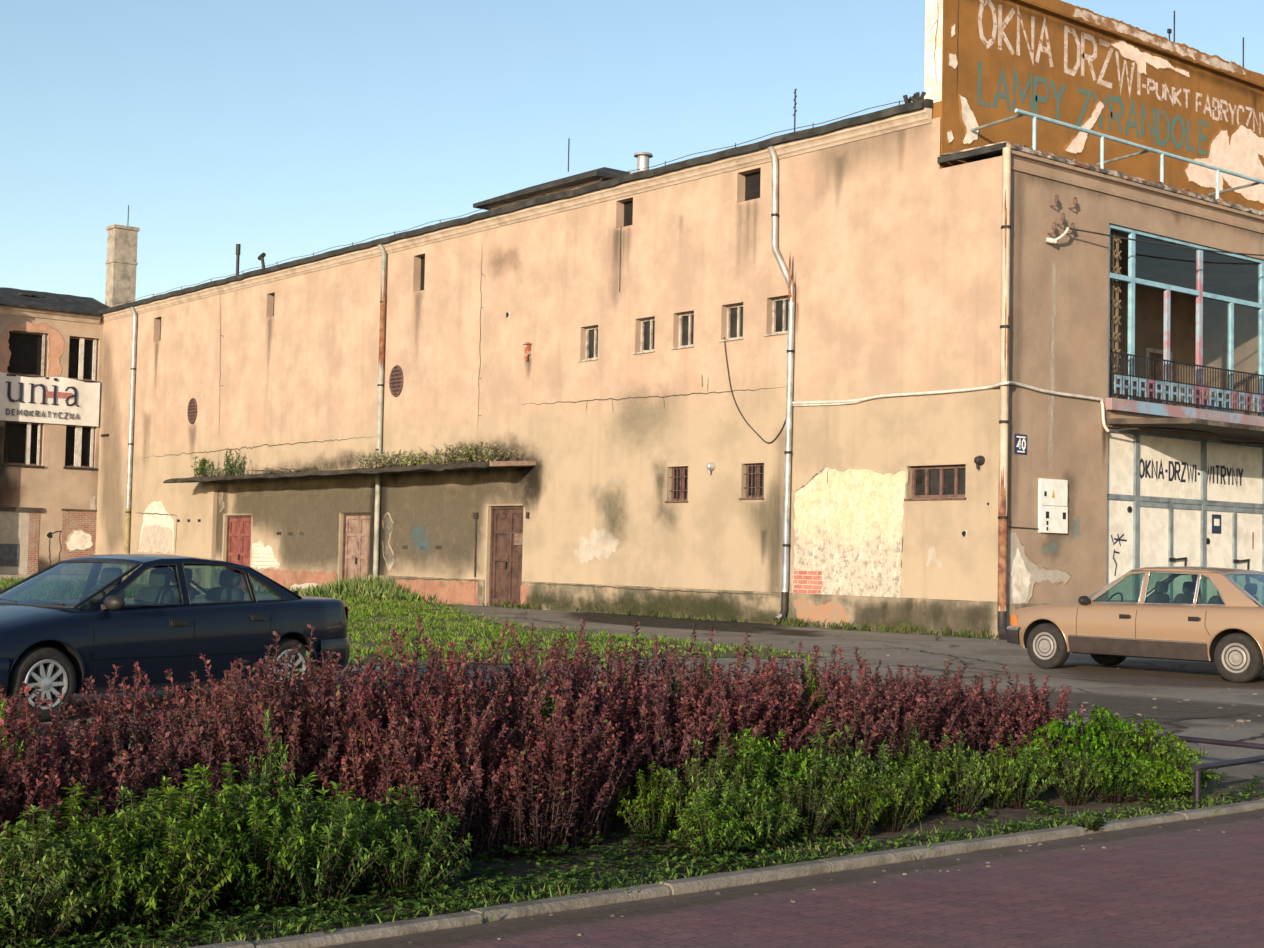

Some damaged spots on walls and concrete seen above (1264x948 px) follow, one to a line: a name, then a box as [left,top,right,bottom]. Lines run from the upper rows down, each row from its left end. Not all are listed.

peeling [1071,6,1247,77]
peeling [946,93,980,147]
peeling [1063,98,1105,156]
peeling [1183,123,1264,207]
flaking render [45,529,94,552]
flaking render [138,499,175,555]
flaking render [790,464,908,625]
flaking render [1007,530,1072,604]